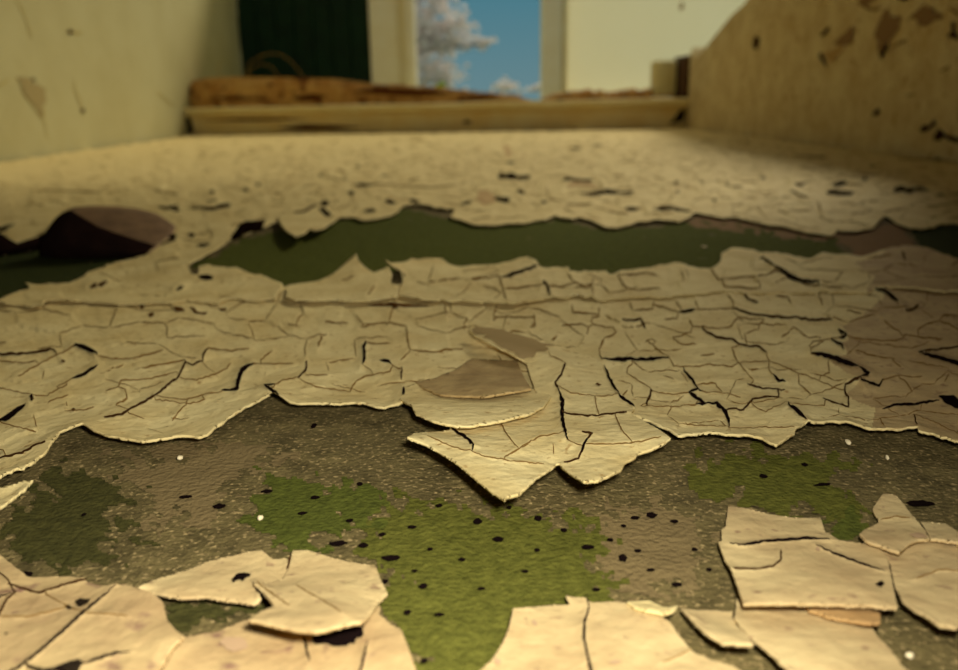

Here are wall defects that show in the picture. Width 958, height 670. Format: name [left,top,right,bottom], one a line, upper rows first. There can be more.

spalling [818,26,854,68]
spalling [874,4,958,60]
spalling [17,77,47,119]
spalling [919,120,958,143]
crack [294,204,319,213]
crack [778,181,821,214]
peeling [0,128,958,510]
crack [0,251,958,464]
peeling [0,540,428,670]
peeling [481,493,958,670]